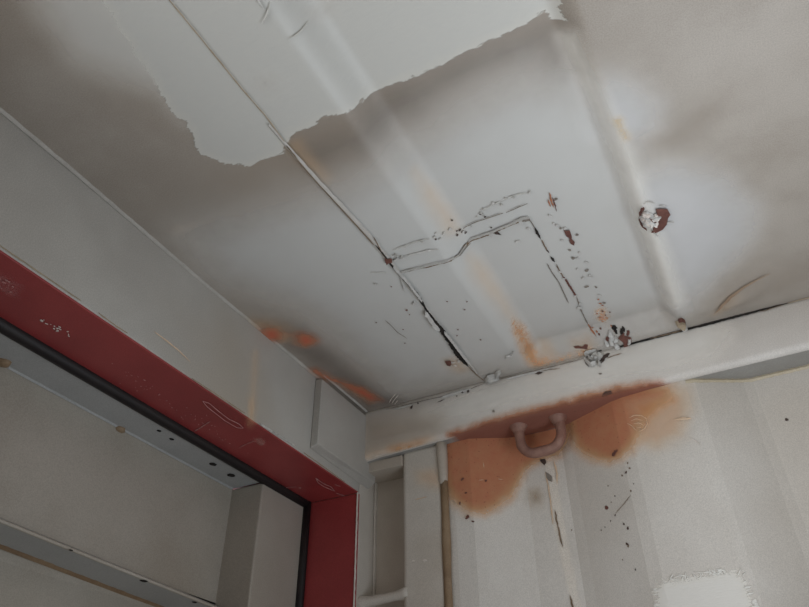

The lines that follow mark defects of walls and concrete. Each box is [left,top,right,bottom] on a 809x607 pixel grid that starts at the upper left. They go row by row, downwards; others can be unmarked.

rust [258,324,319,348]
crack [286,145,809,410]
rust [447,381,683,522]